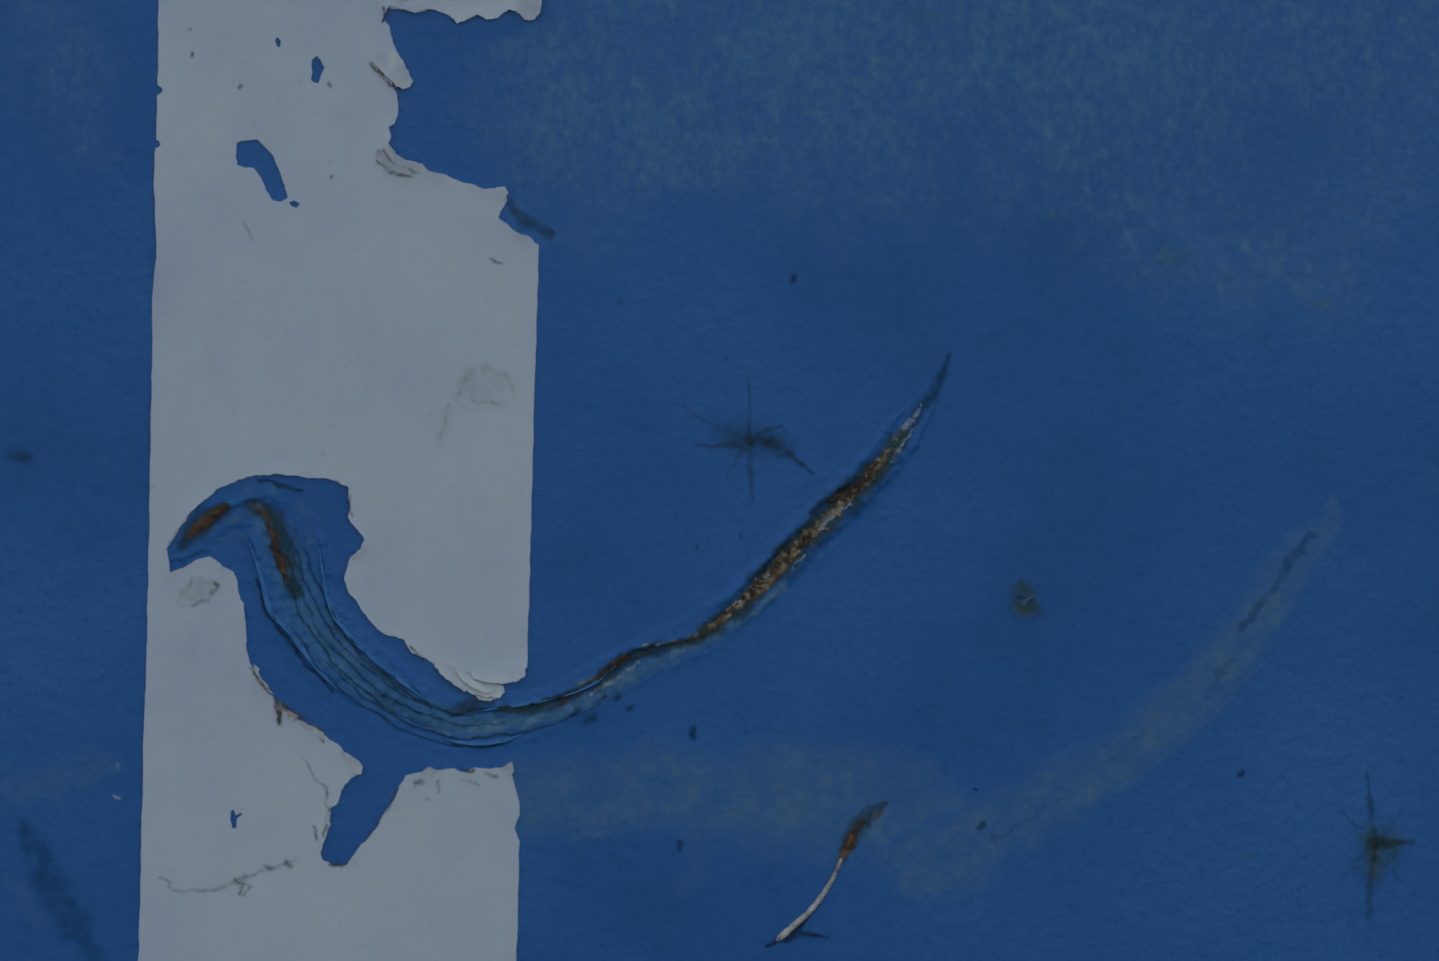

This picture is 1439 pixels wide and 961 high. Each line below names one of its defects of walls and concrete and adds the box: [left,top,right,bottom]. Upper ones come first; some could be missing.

peeling [236,140,299,208]
peeling [371,0,542,224]
corrosion [180,501,302,598]
spalling [167,355,950,867]
corrosion [497,431,909,712]
corrosion [837,802,888,863]